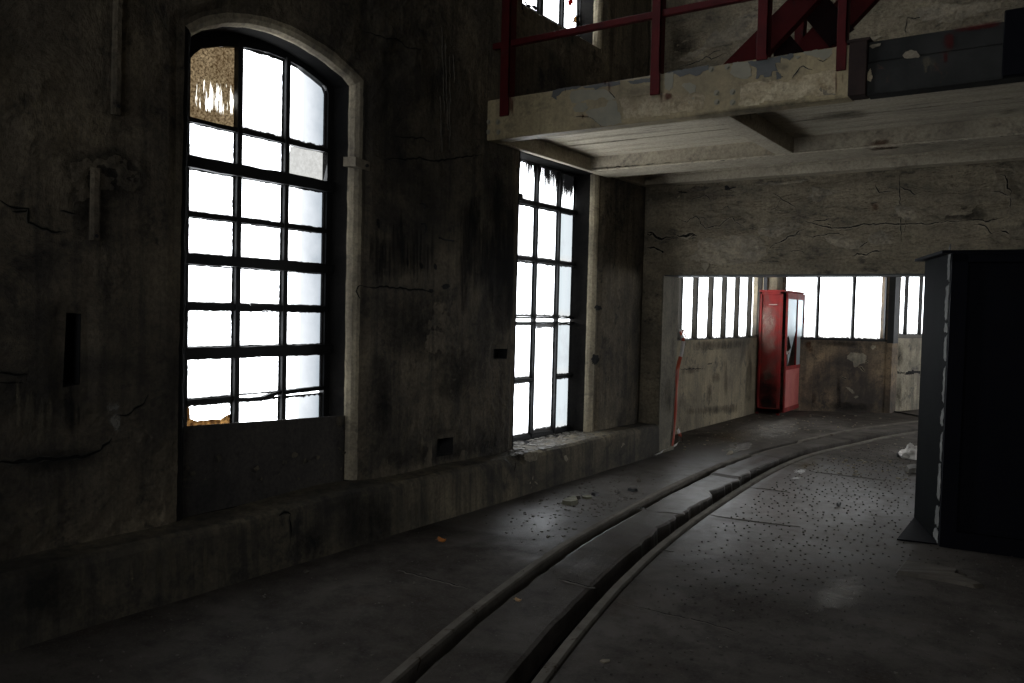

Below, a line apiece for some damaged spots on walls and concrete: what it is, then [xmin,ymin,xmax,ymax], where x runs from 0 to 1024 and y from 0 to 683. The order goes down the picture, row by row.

peeling [730,48,837,106]
crack [0,200,75,234]
crack [760,174,1012,263]